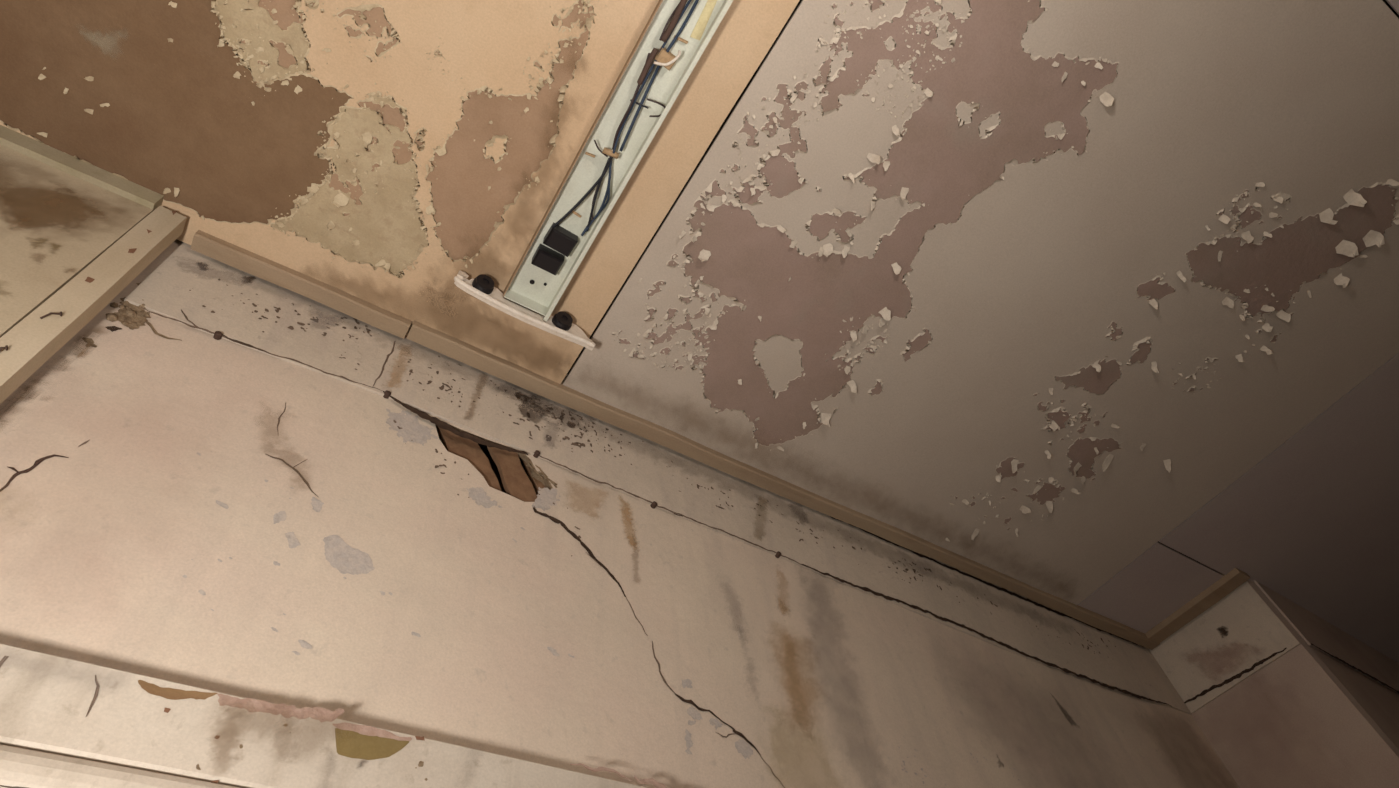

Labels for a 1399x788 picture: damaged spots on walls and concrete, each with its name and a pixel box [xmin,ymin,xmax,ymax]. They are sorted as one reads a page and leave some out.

water stain [0,175,100,228]
peeling [0,0,607,284]
peeling [612,0,1119,451]
crack [0,440,89,492]
crack [141,307,396,391]
water stain [198,262,372,370]
spalling [383,391,561,511]
water stain [398,356,644,465]
peeling [949,179,1399,541]
crack [539,455,1399,706]
crack [533,506,785,788]
peeling [333,723,425,760]